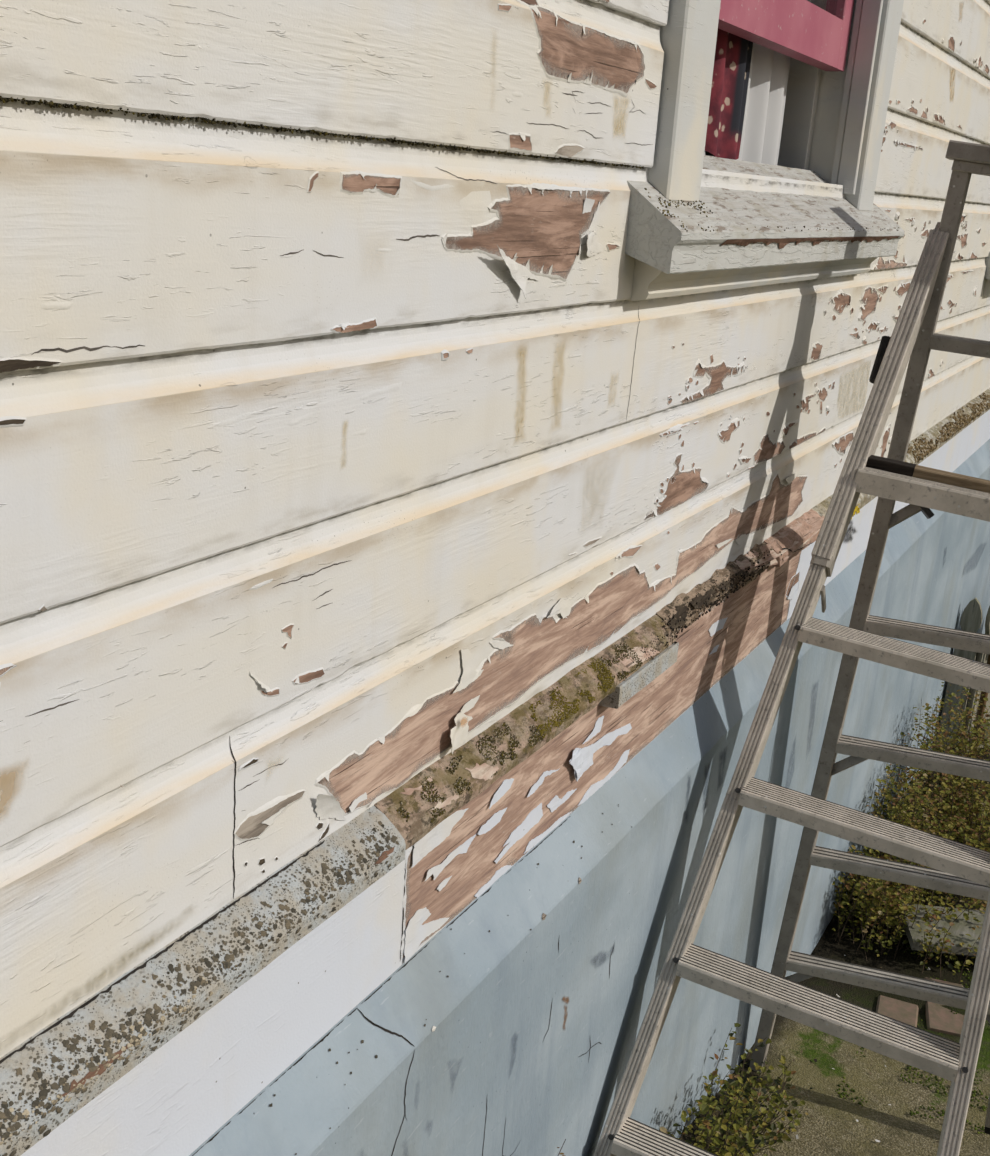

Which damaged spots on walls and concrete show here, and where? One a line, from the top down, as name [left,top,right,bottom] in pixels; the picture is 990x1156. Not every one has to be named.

peeling [498,0,657,98]
peeling [340,170,402,198]
peeling [441,183,621,299]
peeling [644,421,709,520]
peeling [667,354,748,405]
peeling [717,380,835,477]
peeling [810,342,823,362]
peeling [832,431,854,468]
crack [0,699,80,742]
peeling [234,472,825,963]
crack [0,744,325,1064]
crack [192,820,566,1156]